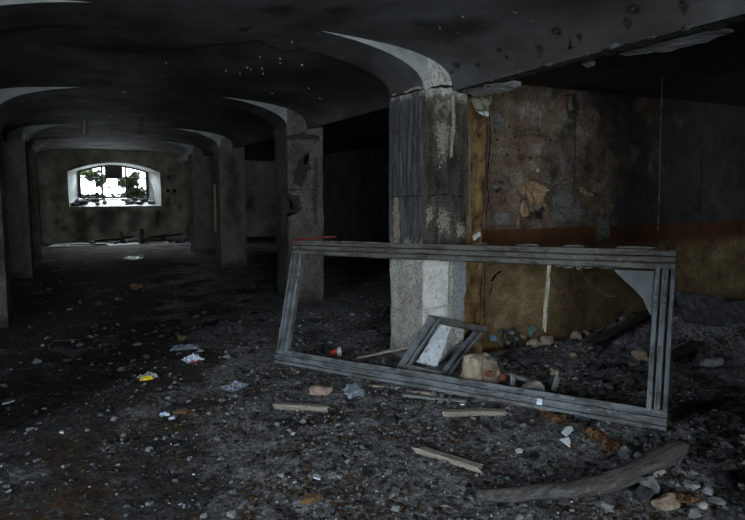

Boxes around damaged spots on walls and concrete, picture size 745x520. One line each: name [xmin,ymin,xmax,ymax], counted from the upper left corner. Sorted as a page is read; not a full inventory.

spalling [391,15,745,167]
spalling [280,152,311,240]
crack [394,113,491,243]
peeling [425,132,481,241]
crack [482,270,502,340]